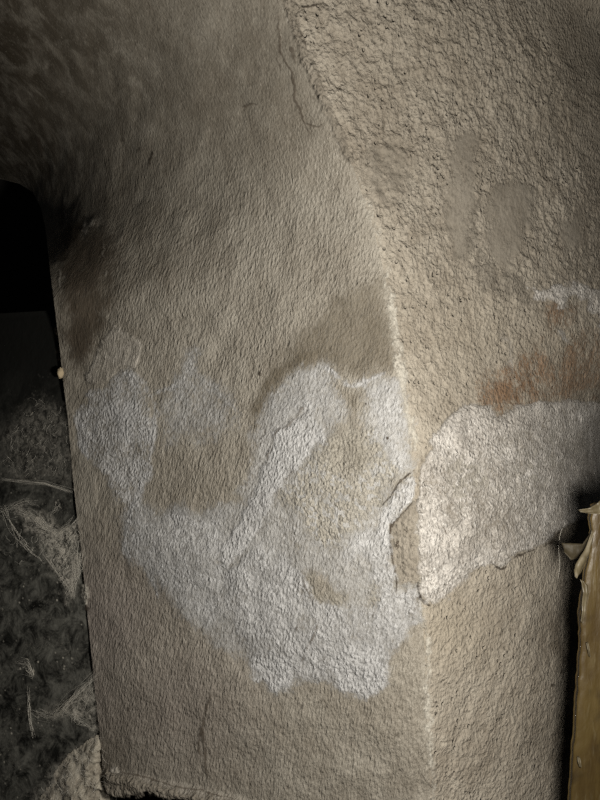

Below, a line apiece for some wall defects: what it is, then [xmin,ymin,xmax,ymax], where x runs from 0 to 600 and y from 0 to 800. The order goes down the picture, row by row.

efflorescence [527,281,600,314]
efflorescence [75,359,600,699]
flaking render [279,427,430,609]